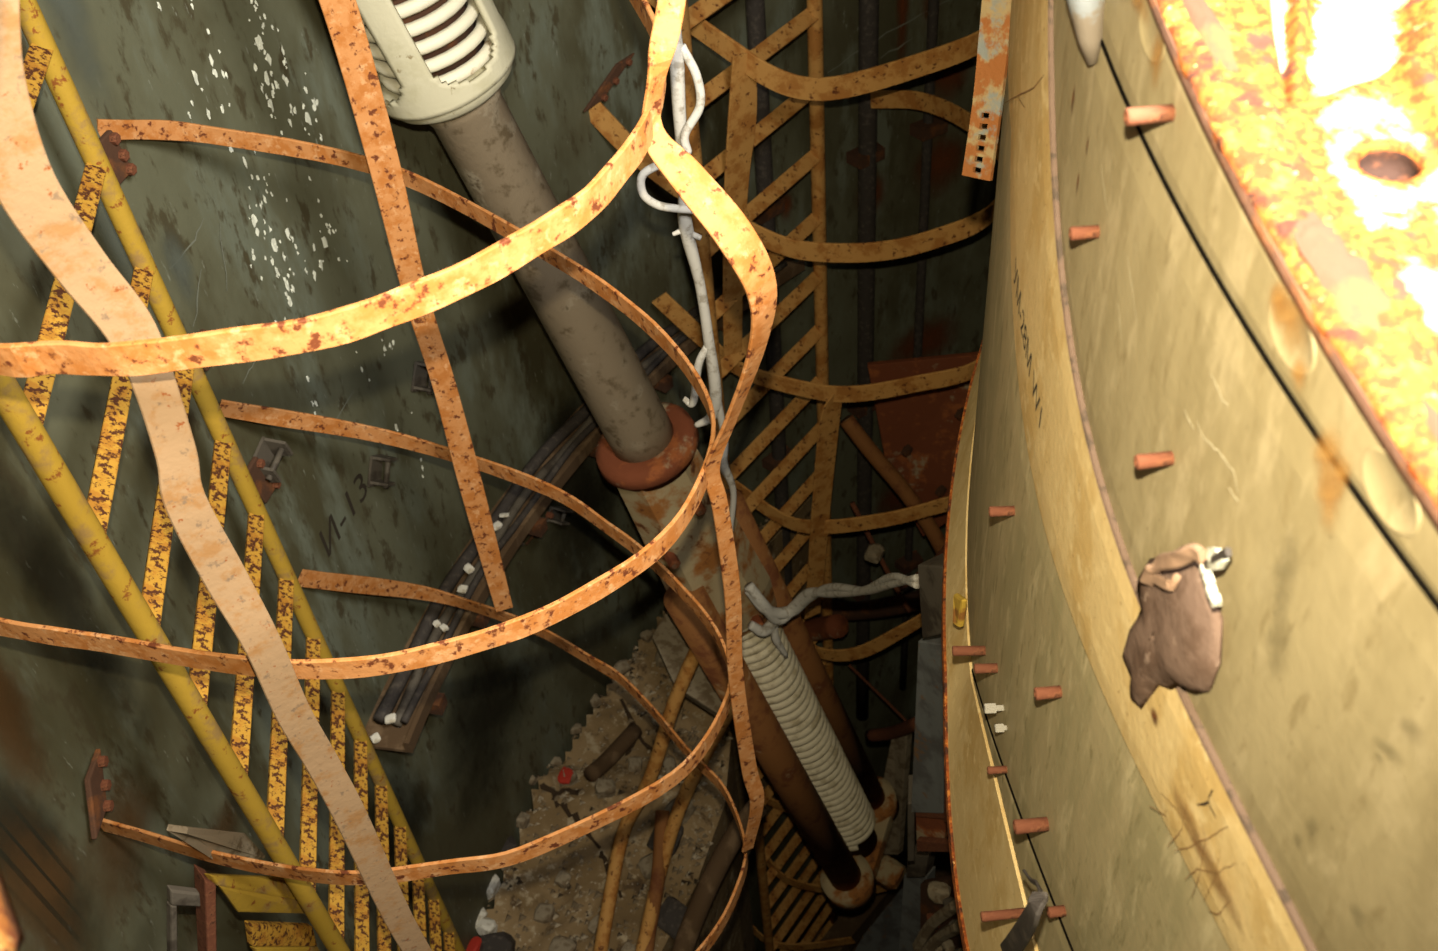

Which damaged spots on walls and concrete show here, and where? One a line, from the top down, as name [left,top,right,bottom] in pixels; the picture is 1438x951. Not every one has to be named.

corrosion [1182,0,1238,72]
leakage [100,217,126,267]
corrosion [1292,211,1390,332]